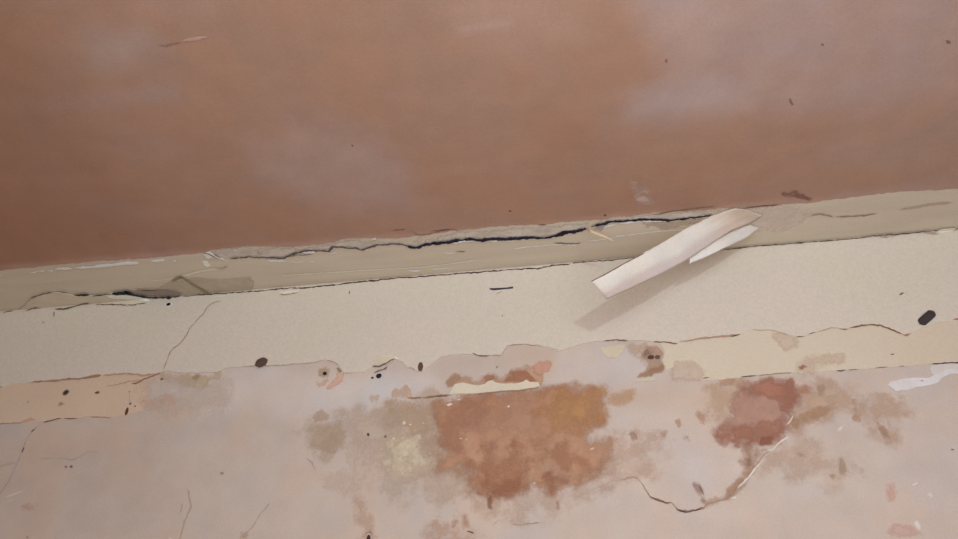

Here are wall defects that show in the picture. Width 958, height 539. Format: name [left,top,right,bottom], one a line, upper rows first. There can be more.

crack [3,204,777,386]
peeling [0,208,958,424]
crack [726,213,956,250]
corrosion [433,361,633,513]
crack [576,416,793,513]
corrosion [710,377,800,496]